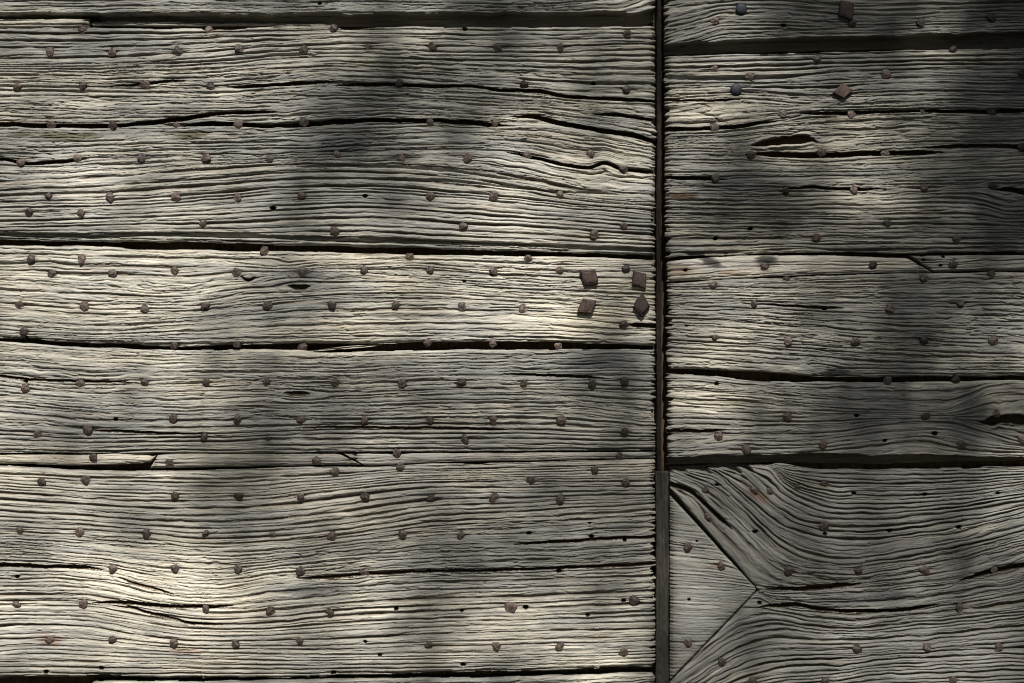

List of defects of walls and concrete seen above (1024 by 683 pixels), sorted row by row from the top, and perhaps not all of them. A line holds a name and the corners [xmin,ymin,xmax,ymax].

crack [0,81,1024,159]
crack [507,152,727,181]
crack [0,562,233,625]